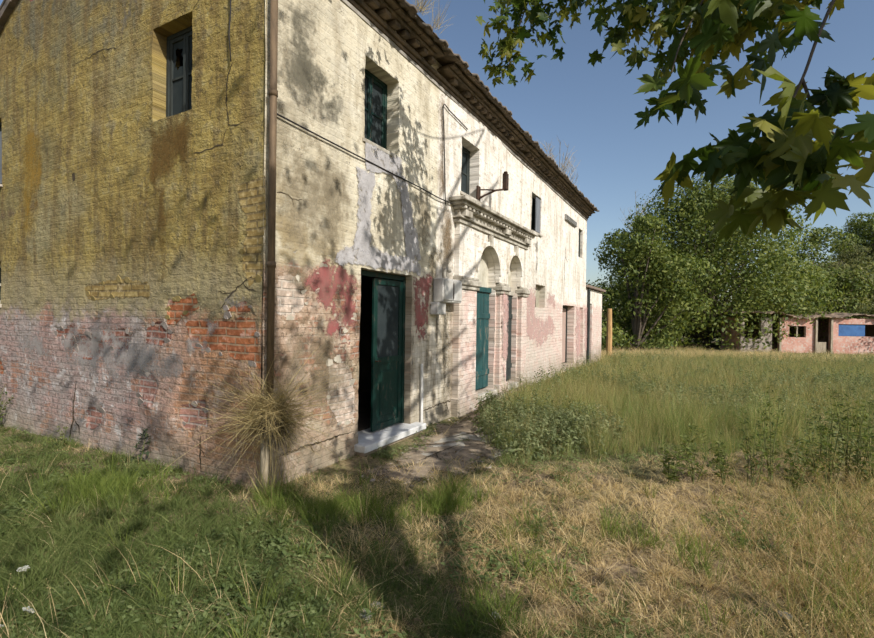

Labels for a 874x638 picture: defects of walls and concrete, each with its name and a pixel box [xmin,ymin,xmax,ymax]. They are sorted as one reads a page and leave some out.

water stain [287,10,342,118]
crack [194,62,242,154]
spalling [236,175,266,287]
spalling [54,322,132,361]
peeling [85,275,150,301]
spalling [146,293,260,369]
crack [219,276,255,308]
peeling [276,259,357,425]
peeling [413,274,432,340]